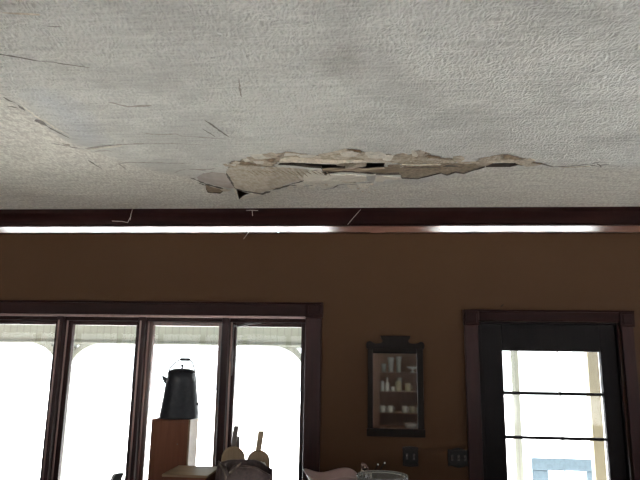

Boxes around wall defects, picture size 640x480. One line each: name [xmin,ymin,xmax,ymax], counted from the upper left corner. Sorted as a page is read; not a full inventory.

crack [0,54,89,68]
crack [4,97,220,173]
peeling [191,149,544,200]
crack [541,161,609,169]